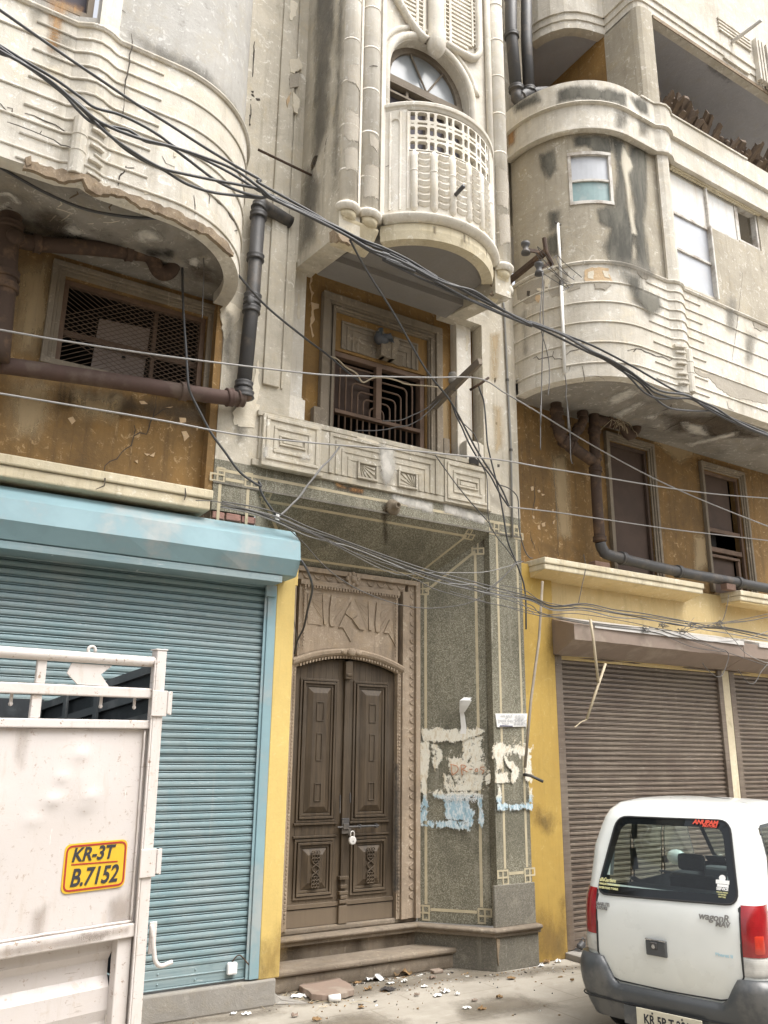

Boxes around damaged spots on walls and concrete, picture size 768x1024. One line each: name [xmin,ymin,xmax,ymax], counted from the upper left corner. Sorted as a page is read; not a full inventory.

peeling [289,0,298,21]
crack [121,10,133,119]
peeling [286,57,303,114]
water stain [35,212,81,236]
spalling [22,156,234,257]
water stain [135,230,173,257]
water stain [575,136,662,315]
peeling [220,302,241,340]
peeling [232,359,260,428]
peeling [694,369,768,404]
crack [97,396,157,489]